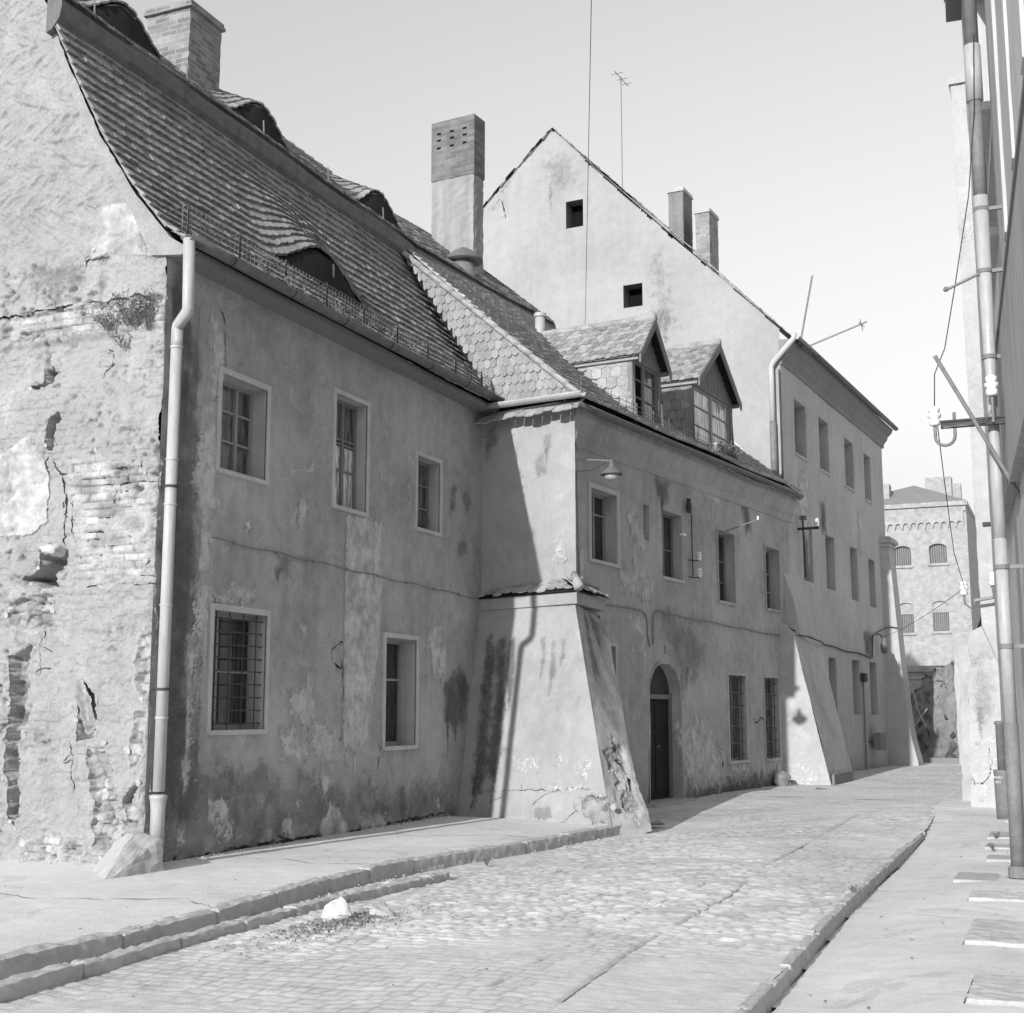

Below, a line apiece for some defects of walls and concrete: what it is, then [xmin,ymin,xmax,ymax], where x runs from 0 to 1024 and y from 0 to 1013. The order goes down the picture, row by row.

crack [0,293,166,320]
spalling [24,364,60,393]
spalling [41,409,63,453]
flaking render [3,448,153,636]
crack [45,458,163,560]
flaking render [19,630,159,862]
crack [173,785,589,861]
damp [445,665,468,743]
damp [470,639,514,808]
spalling [577,733,645,826]